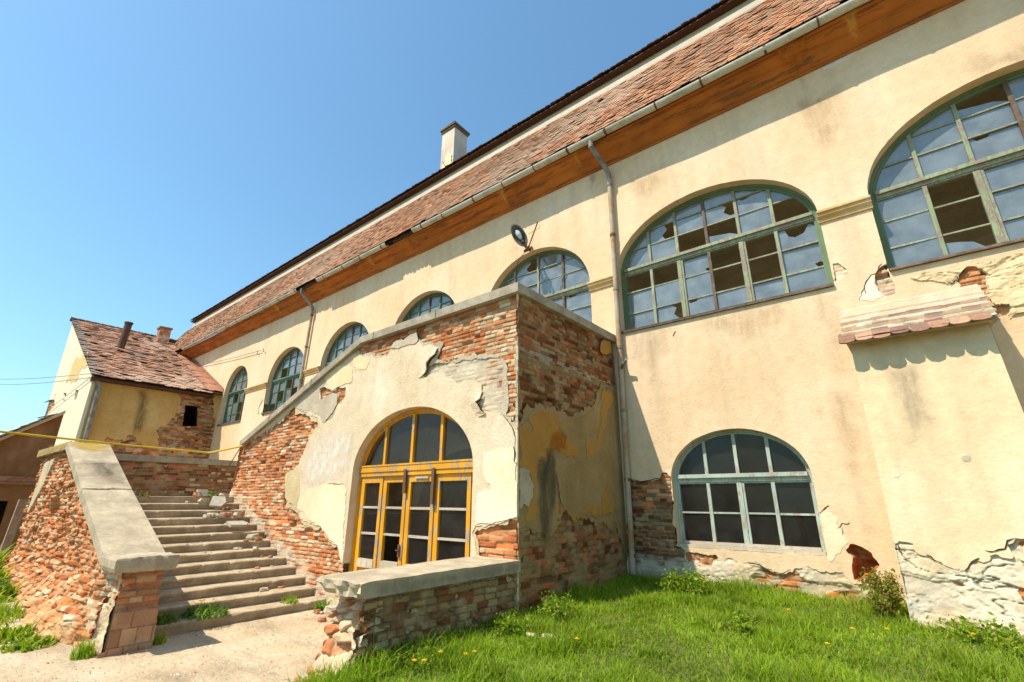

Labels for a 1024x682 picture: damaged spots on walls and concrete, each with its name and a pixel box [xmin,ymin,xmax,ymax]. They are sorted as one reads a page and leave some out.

flaking render [860,266,895,301]
flaking render [910,253,1024,323]
flaking render [104,295,718,615]
peeling [820,510,879,587]
flaking render [897,541,915,554]